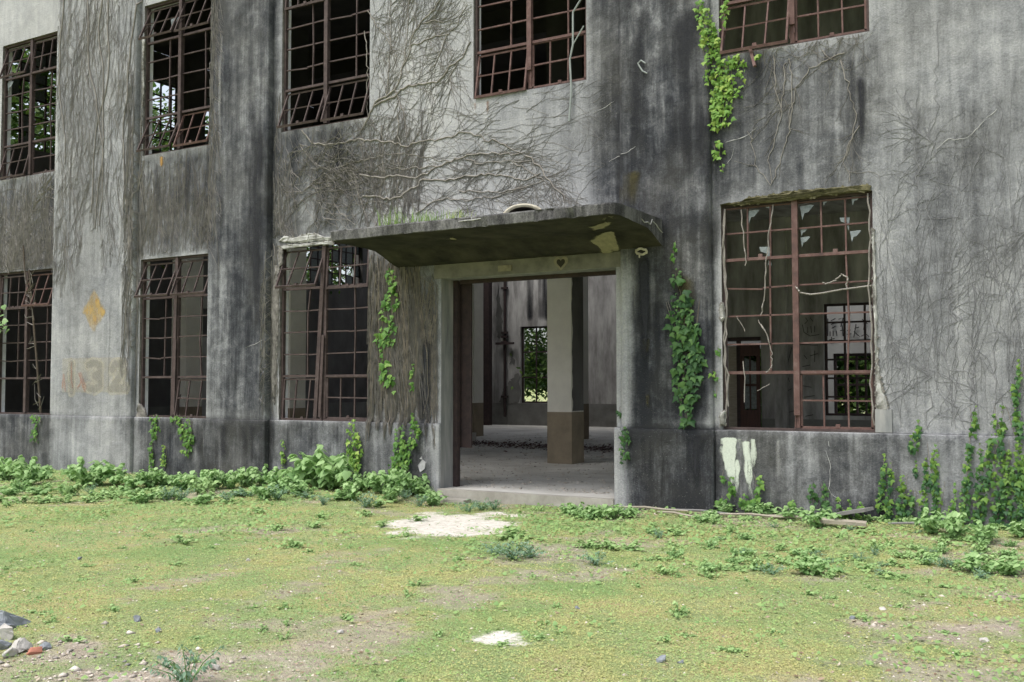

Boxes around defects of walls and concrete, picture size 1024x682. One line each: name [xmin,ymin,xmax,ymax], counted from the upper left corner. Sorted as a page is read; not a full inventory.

damp [674,10,703,147]
damp [248,118,262,295]
peeling [590,216,619,253]
damp [638,258,649,358]